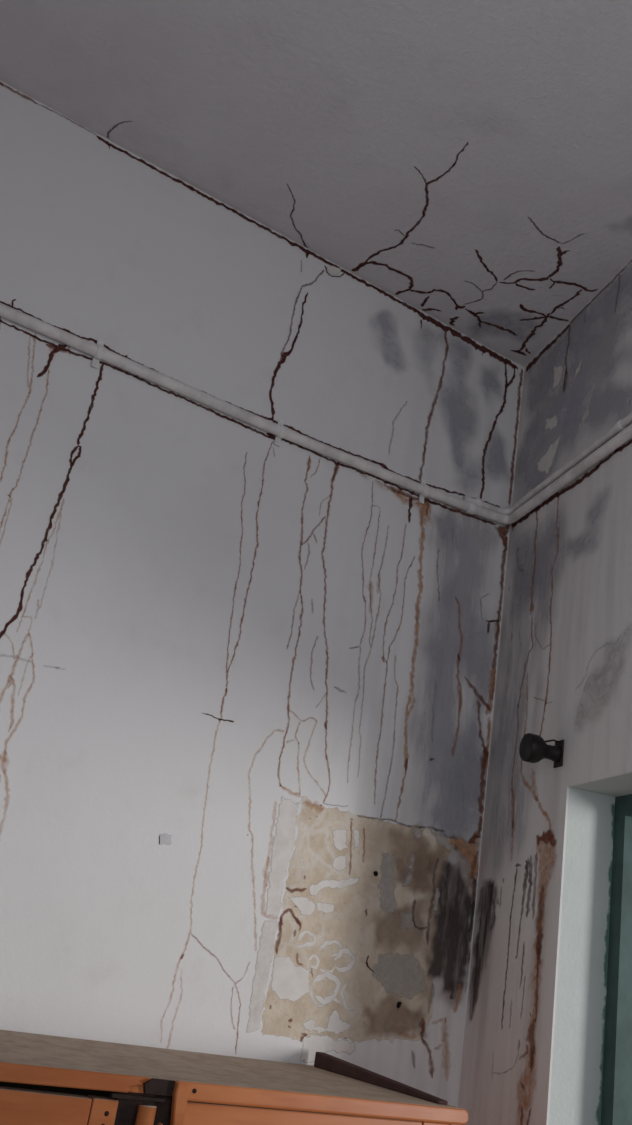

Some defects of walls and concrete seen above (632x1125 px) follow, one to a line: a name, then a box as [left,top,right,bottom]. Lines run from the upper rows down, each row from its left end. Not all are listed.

crack [0,362,104,638]
crack [0,83,619,505]
corrosion [0,299,632,888]
water stain [444,343,474,477]
water stain [420,518,525,835]
water stain [519,270,632,488]
flaking render [247,796,455,1063]
water stain [412,854,538,1028]
corrosion [520,813,556,1125]